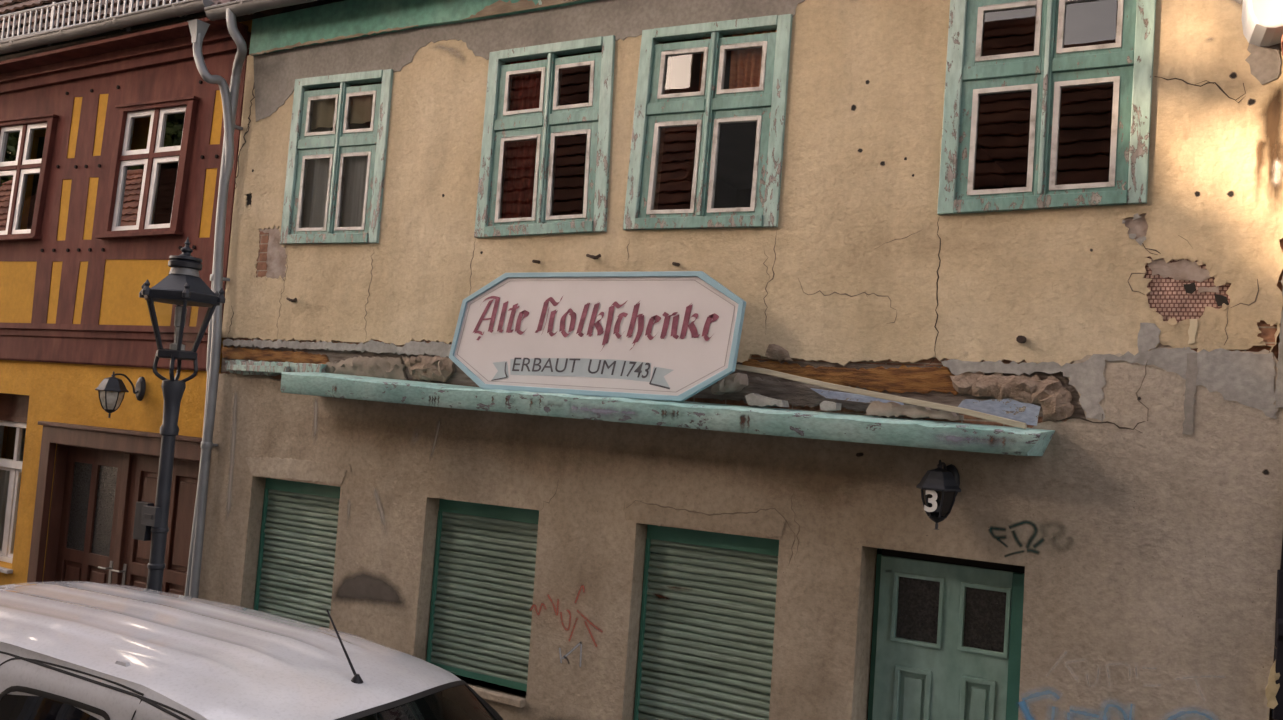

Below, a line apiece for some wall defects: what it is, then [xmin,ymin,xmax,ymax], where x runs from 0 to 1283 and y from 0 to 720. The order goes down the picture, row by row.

peeling [462,0,581,20]
peeling [250,25,418,56]
spalling [254,226,287,281]
crack [763,232,897,335]
crack [875,219,941,365]
spalling [1122,213,1231,326]
spalling [325,354,455,382]
spalling [765,344,793,362]
spalling [1256,318,1277,346]
spalling [950,371,1075,422]